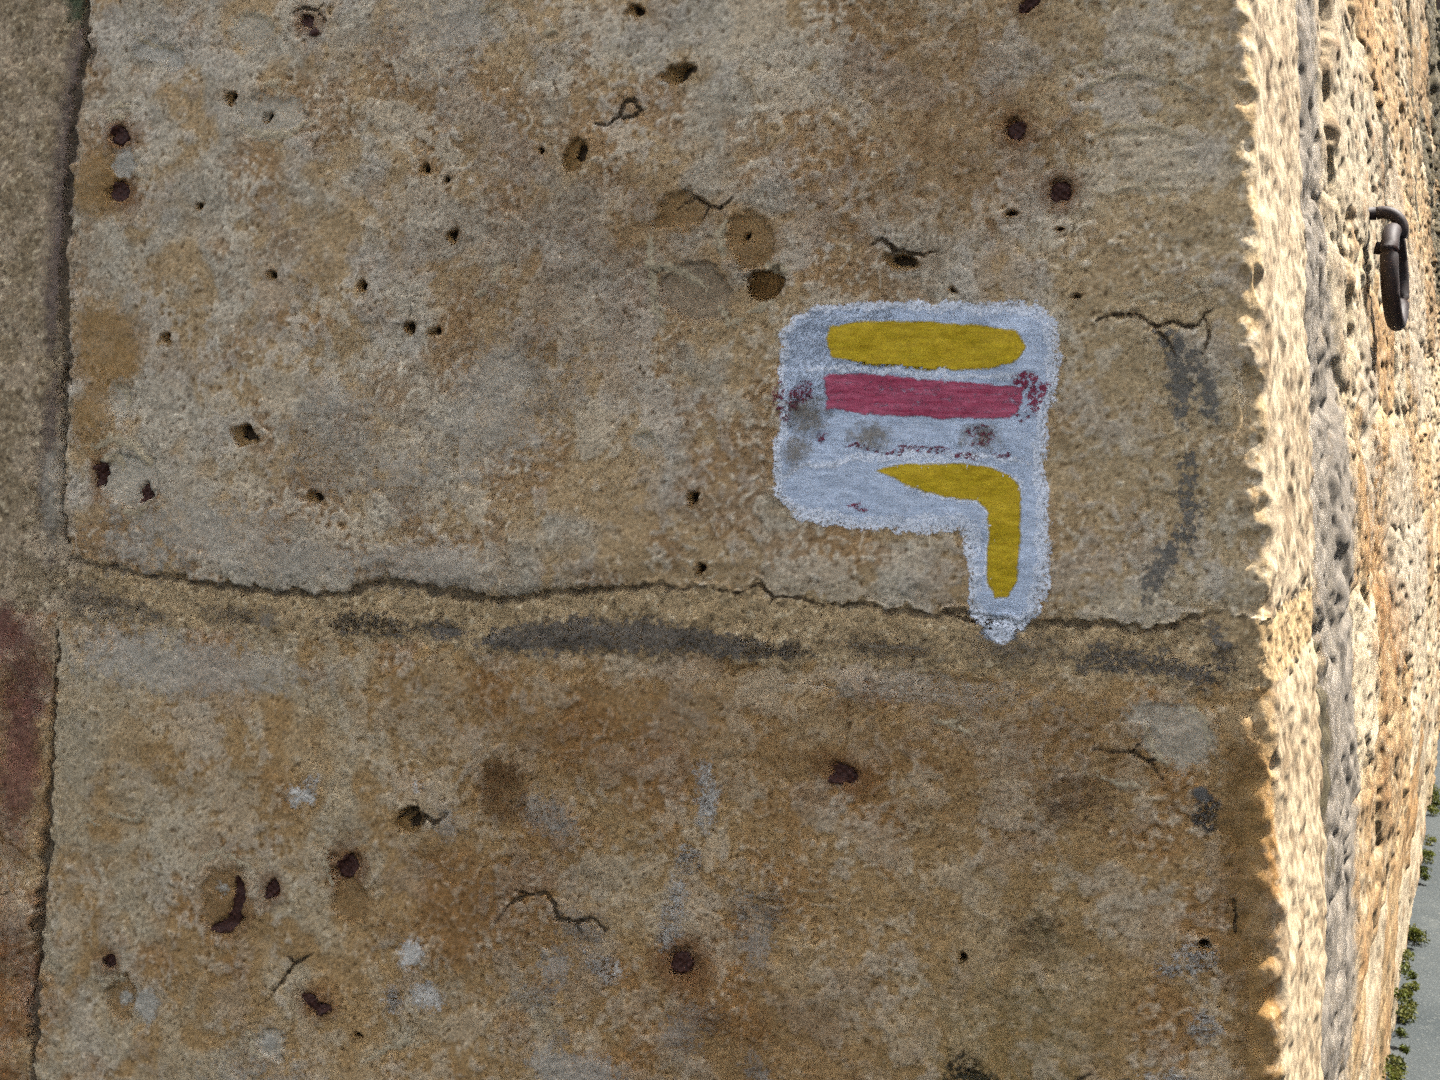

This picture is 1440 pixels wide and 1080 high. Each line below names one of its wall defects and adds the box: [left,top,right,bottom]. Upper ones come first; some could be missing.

crack [594,97,643,126]
crack [677,195,733,219]
crack [57,0,96,535]
crack [871,237,937,262]
crack [1096,308,1213,357]
water stain [1133,328,1222,606]
crack [85,563,1200,633]
water stain [316,609,815,668]
rust [211,875,246,933]
rust [263,876,281,900]
crack [494,890,606,933]
rust [657,938,706,987]